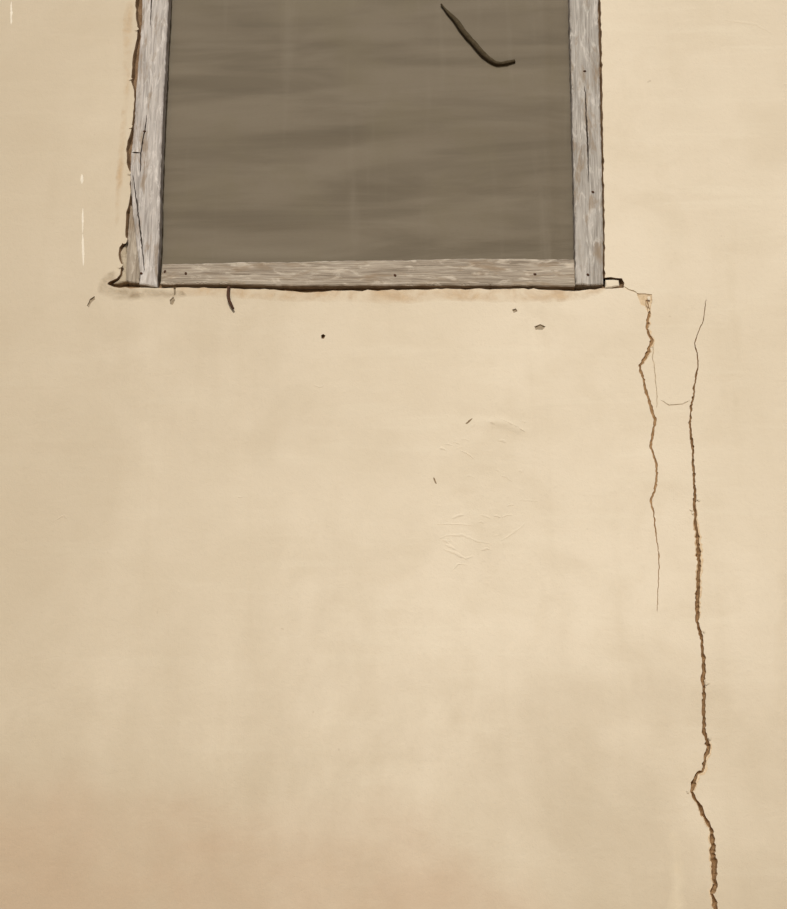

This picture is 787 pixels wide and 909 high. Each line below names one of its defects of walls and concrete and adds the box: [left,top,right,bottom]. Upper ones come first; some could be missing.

flaking render [108,0,143,289]
flaking render [562,0,624,291]
crack [625,287,718,909]